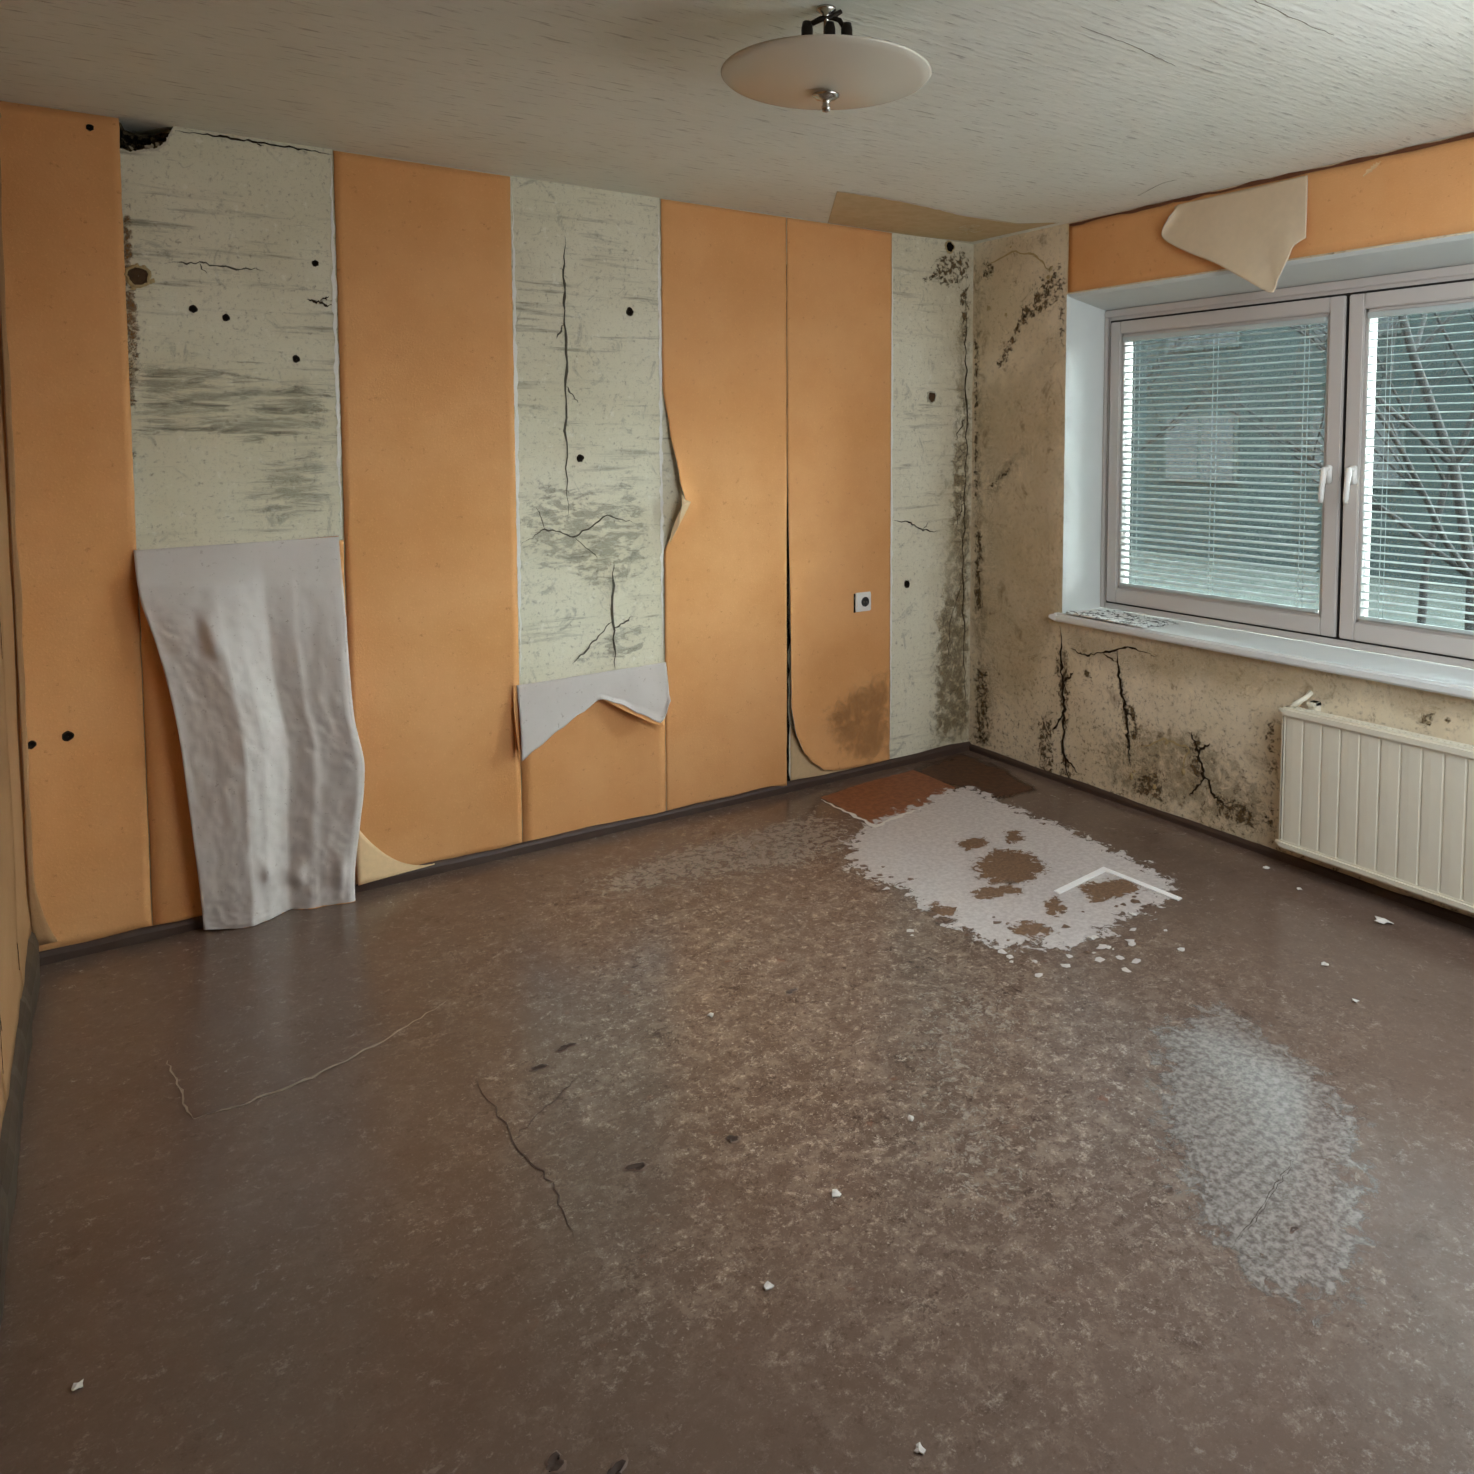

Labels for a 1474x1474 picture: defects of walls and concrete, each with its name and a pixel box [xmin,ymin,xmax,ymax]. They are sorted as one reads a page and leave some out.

flaking render [119,122,173,153]
peeling [1161,175,1308,293]
leakage [923,247,1010,497]
leakage [997,263,1066,368]
crack [526,240,633,666]
peeling [133,535,435,930]
peeling [513,662,671,761]
leakage [1038,648,1092,777]
crack [1052,629,1155,778]
crack [1189,732,1225,806]
leakage [1216,722,1277,831]
peeling [836,786,1183,977]